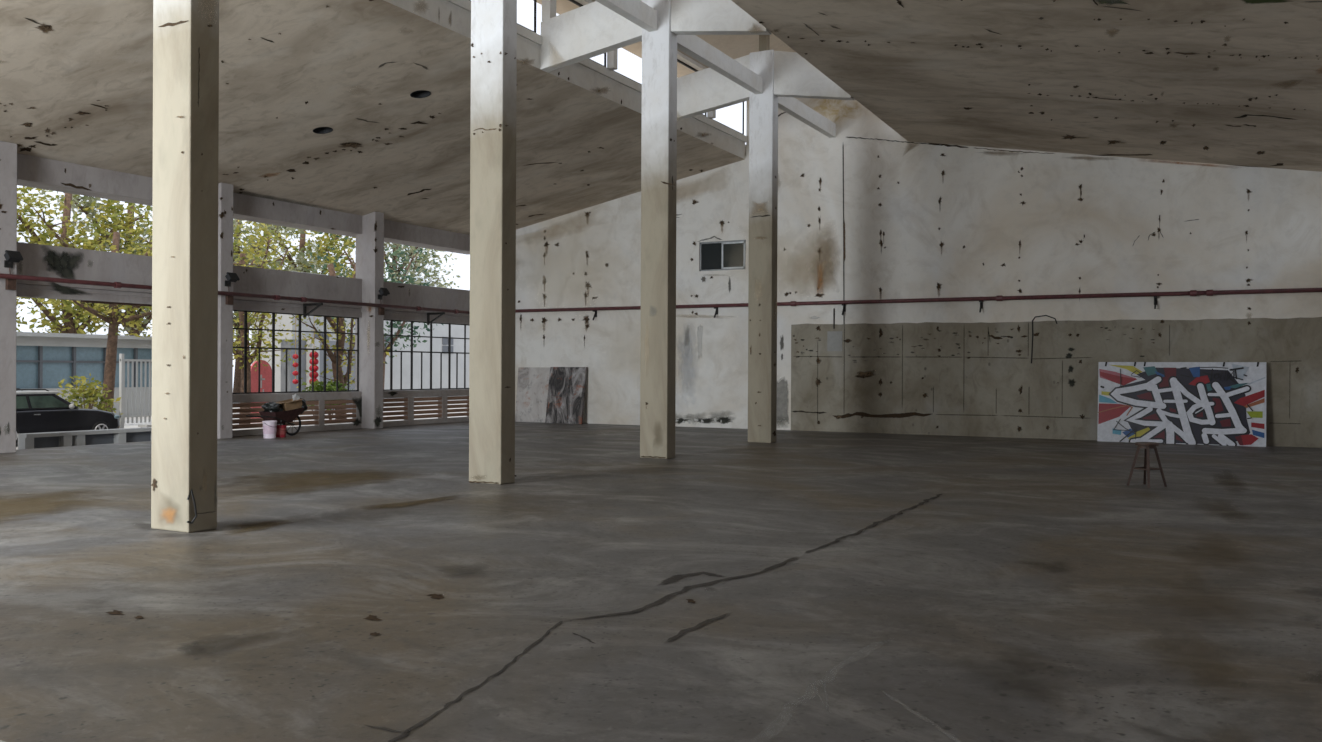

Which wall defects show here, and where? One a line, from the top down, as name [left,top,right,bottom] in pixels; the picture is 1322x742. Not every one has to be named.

leakage [675,414,731,424]
crack [662,572,723,603]